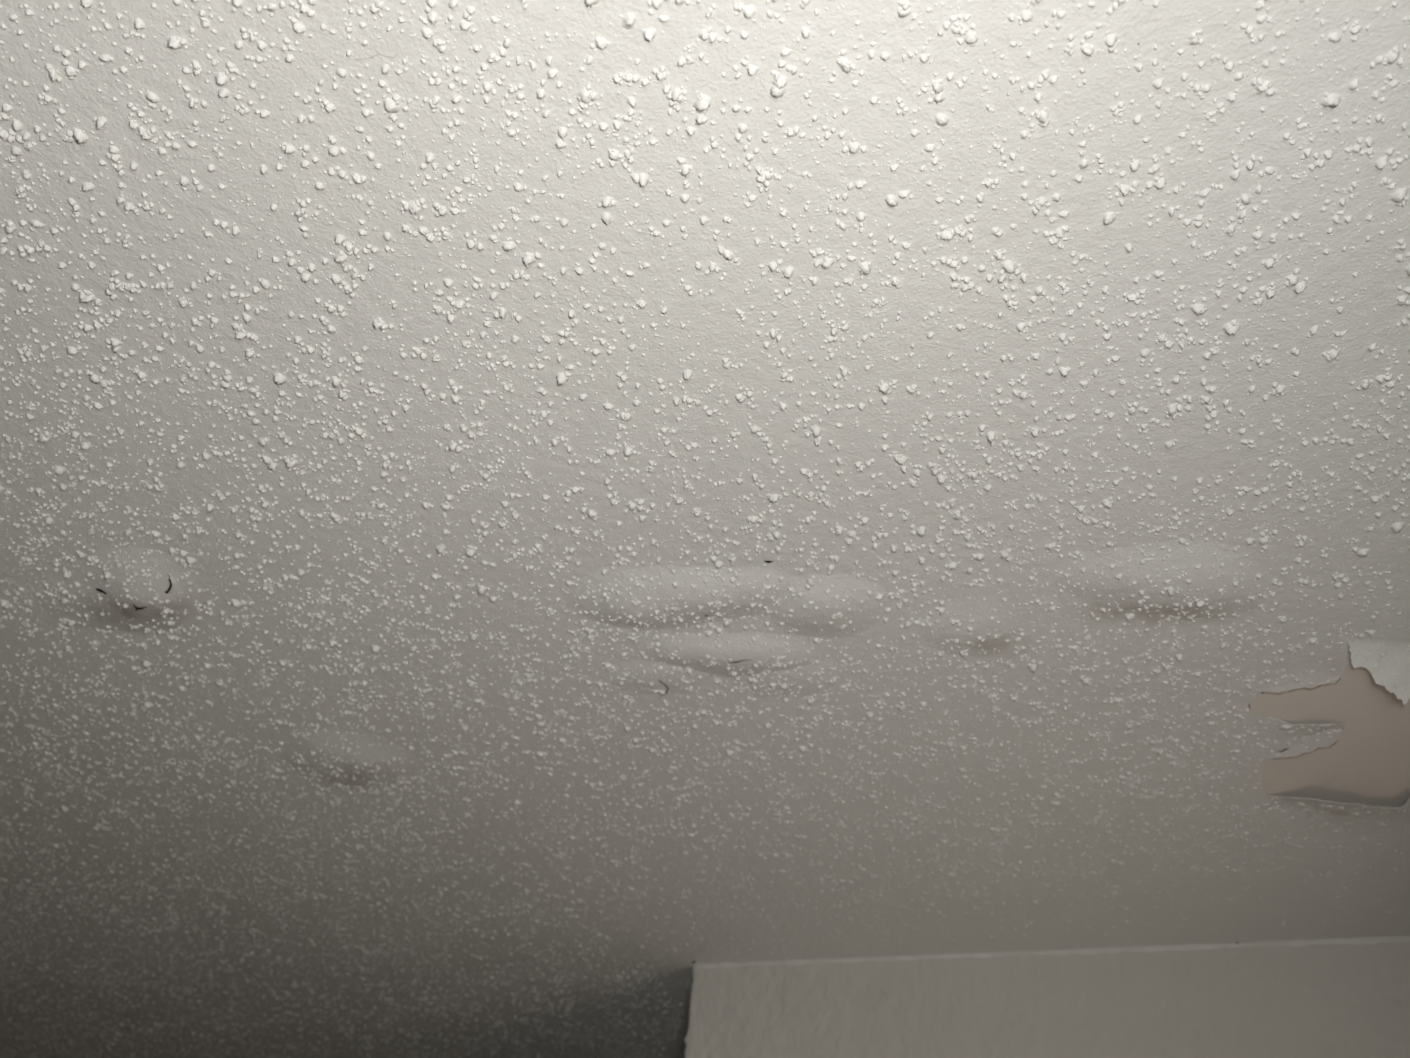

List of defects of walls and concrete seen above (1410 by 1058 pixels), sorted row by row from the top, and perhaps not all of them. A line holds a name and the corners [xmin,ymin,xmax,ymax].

peeling [1245,639,1410,833]